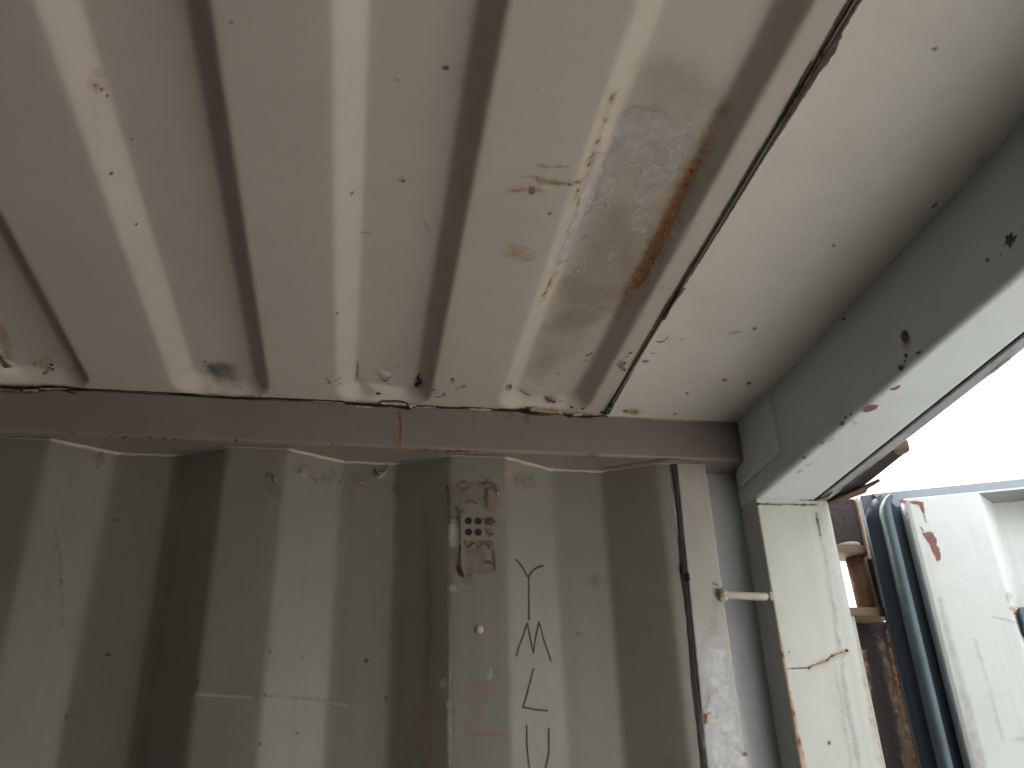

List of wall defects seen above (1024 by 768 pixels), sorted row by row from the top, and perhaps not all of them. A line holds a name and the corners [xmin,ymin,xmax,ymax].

rust [625,158,701,293]